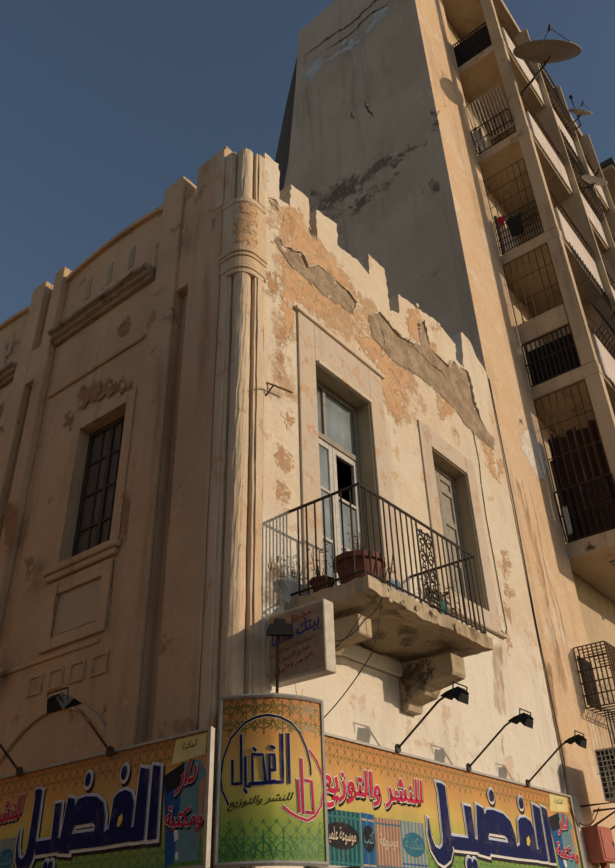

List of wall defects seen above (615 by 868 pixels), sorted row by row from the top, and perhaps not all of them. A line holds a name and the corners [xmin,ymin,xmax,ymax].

crack [304,0,394,56]
flaking render [232,197,505,484]
peeling [273,443,295,511]